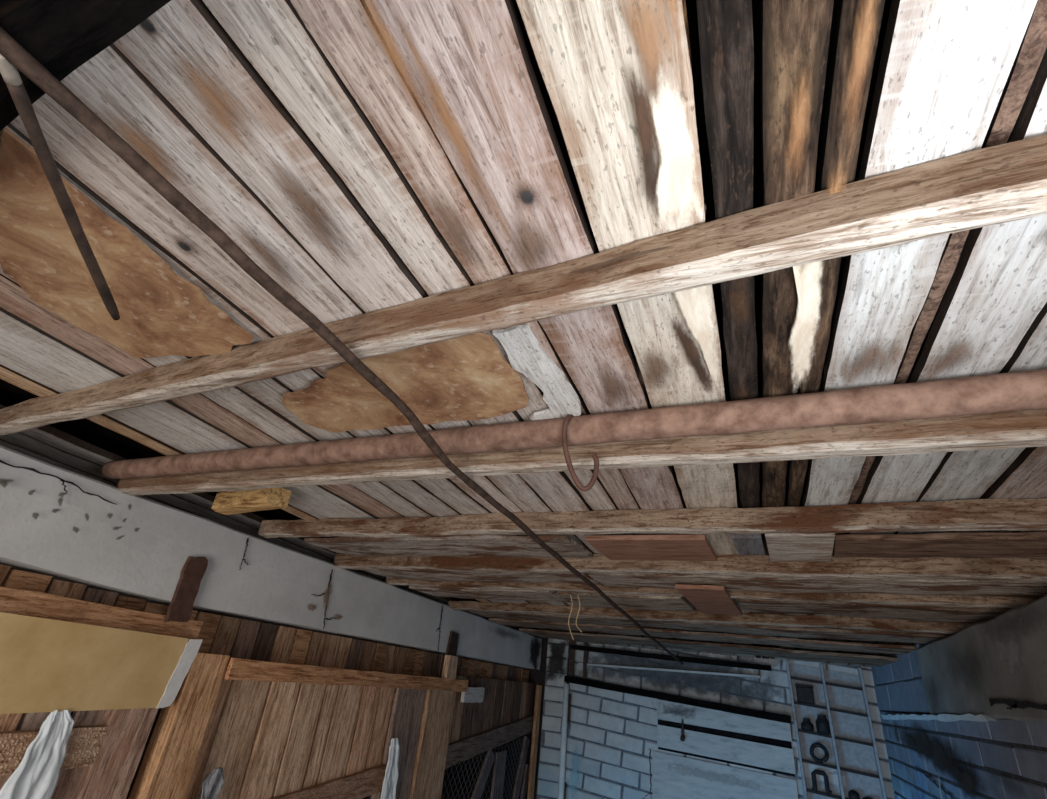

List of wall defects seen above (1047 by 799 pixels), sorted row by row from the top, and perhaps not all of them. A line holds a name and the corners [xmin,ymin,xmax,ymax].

crack [0,460,117,505]
crack [312,569,337,629]
crack [989,698,1047,710]